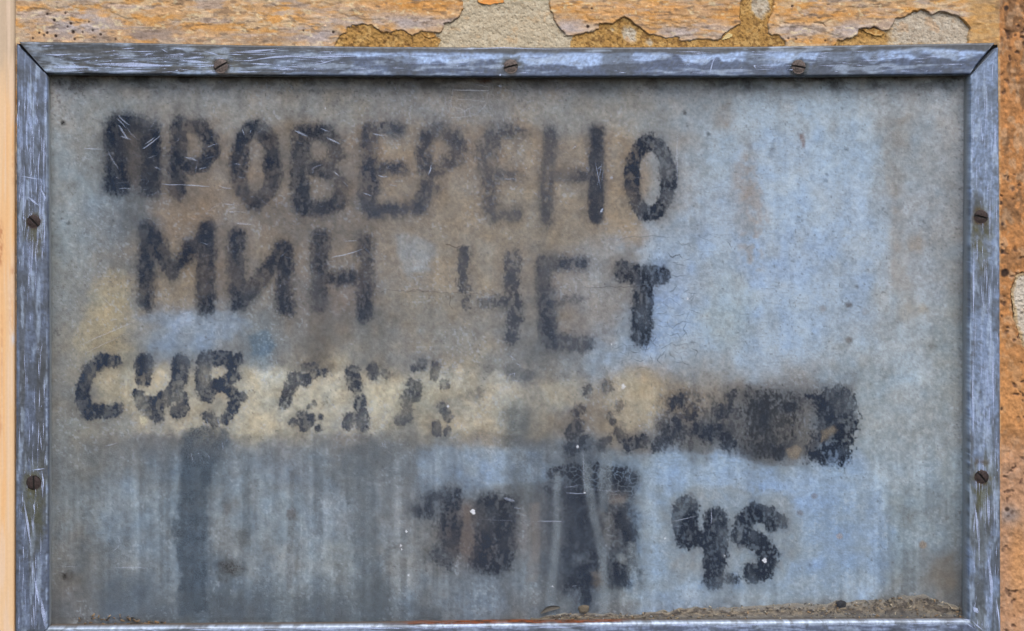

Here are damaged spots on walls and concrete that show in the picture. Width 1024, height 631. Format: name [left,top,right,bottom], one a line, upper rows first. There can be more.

flaking render [335,0,785,48]
flaking render [834,10,969,46]